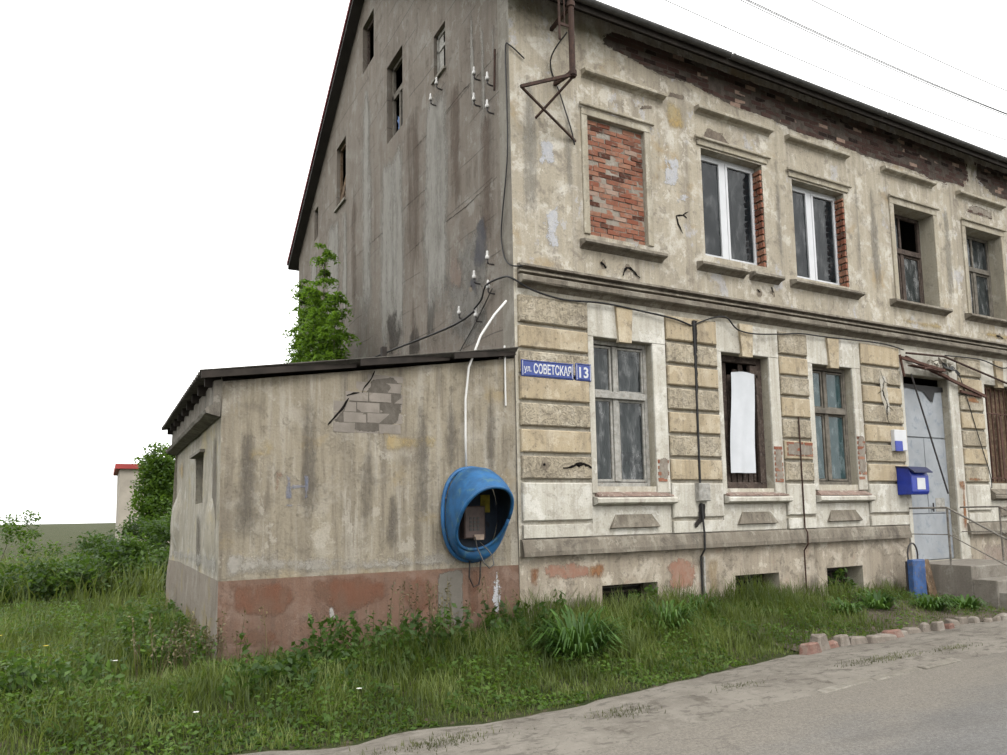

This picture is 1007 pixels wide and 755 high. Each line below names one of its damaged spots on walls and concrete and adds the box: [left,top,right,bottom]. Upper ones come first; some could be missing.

spalling [600,28,1007,201]
damp [362,94,404,347]
damp [423,92,449,312]
spalling [968,205,992,219]
damp [311,215,347,329]
spalling [333,374,403,434]
damp [240,437,253,528]
damp [387,420,431,504]
damp [227,555,459,574]
peeling [314,576,384,613]